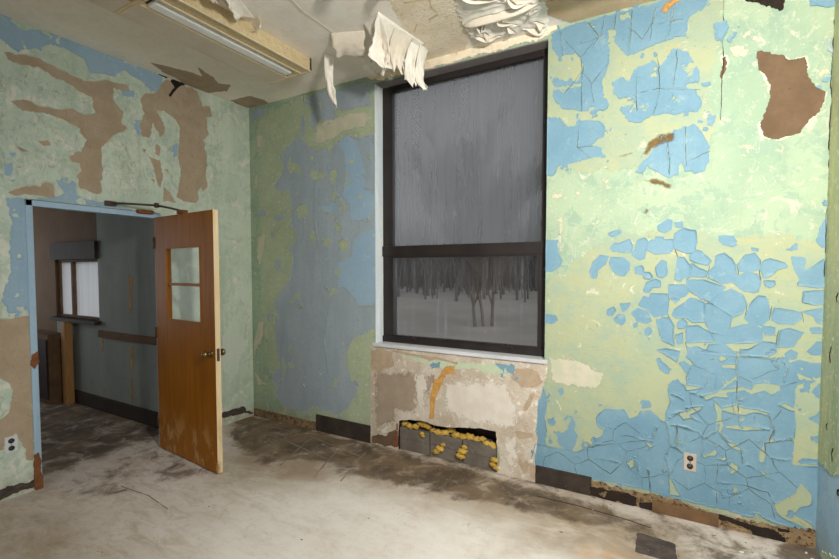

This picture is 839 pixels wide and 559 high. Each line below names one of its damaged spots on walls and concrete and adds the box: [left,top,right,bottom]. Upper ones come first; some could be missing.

flaking render [0,14,230,461]
peeling [221,0,839,559]
crack [537,496,651,528]
crack [562,3,700,158]
crack [543,260,796,517]
crack [667,126,710,175]